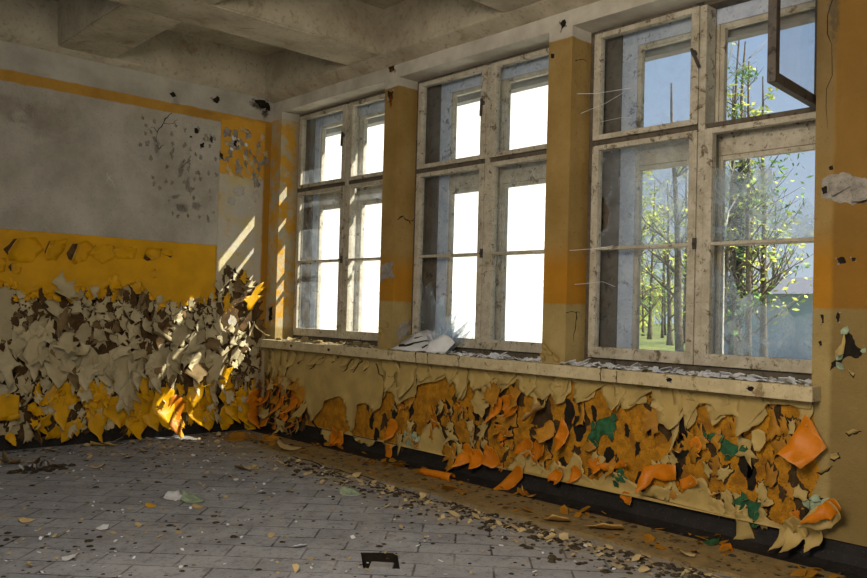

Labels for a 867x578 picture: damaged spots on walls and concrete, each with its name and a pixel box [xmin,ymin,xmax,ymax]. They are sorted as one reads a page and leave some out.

peeling [151,123,269,200]
peeling [821,165,867,206]
flaking render [830,312,866,378]
peeling [0,229,841,553]